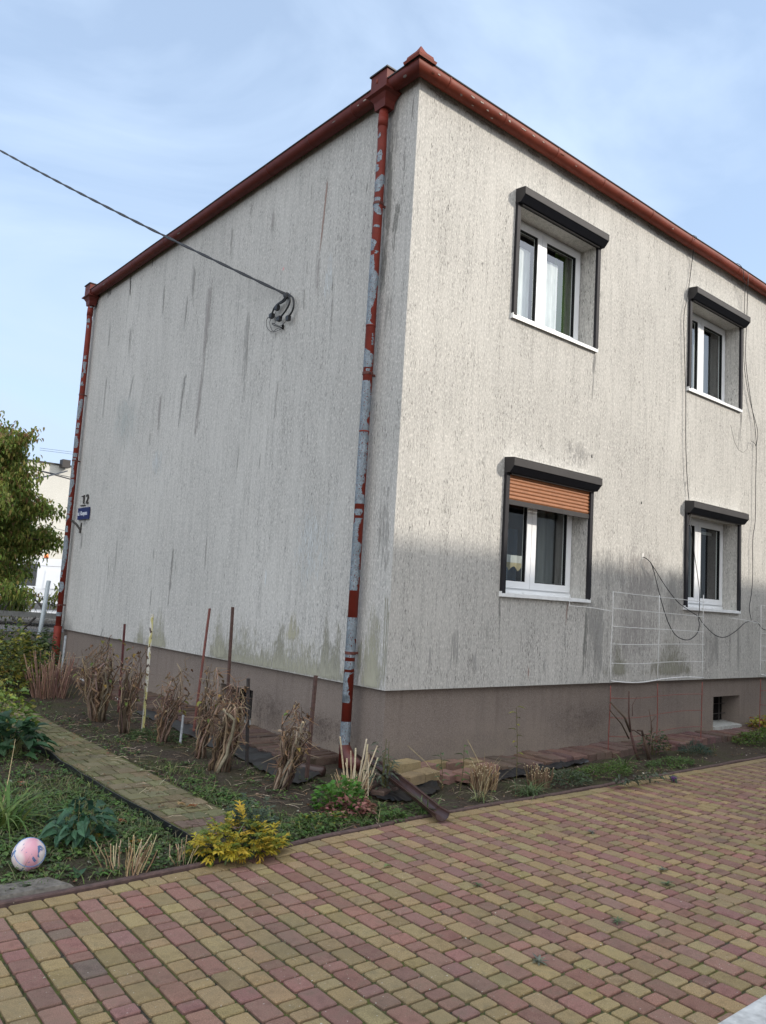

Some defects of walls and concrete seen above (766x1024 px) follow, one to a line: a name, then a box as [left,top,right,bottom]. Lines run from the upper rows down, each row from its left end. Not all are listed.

leakage [194,282,212,434]
peeling [349,133,385,591]
peeling [59,399,83,592]
peeling [339,722,351,745]
peeling [342,617,358,703]
leakage [582,545,685,679]